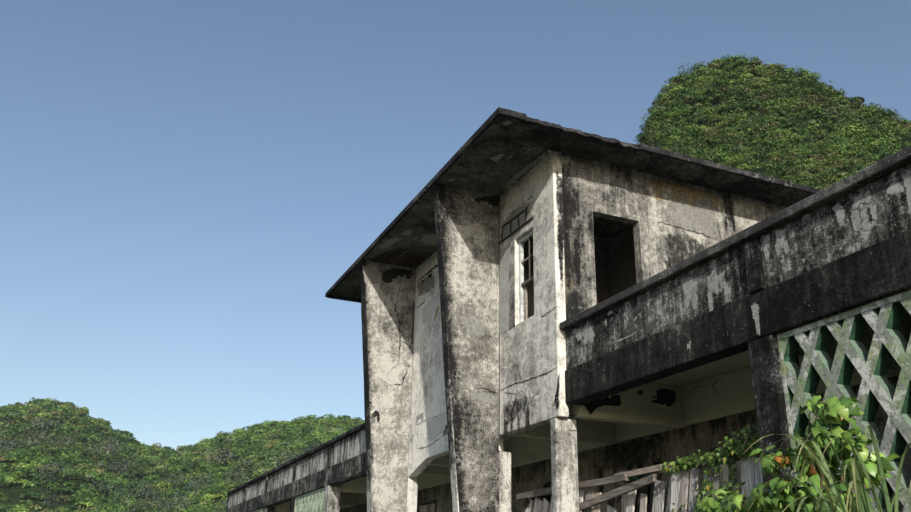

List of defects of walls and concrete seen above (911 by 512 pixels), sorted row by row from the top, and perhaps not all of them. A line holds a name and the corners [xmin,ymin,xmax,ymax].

damp [556,153,581,289]
damp [648,178,736,232]
peeling [832,190,877,232]
peeling [903,171,911,211]
damp [665,234,710,268]
crack [384,264,438,386]
efflorescence [751,304,760,335]
crack [474,367,557,398]
peeling [427,414,448,441]